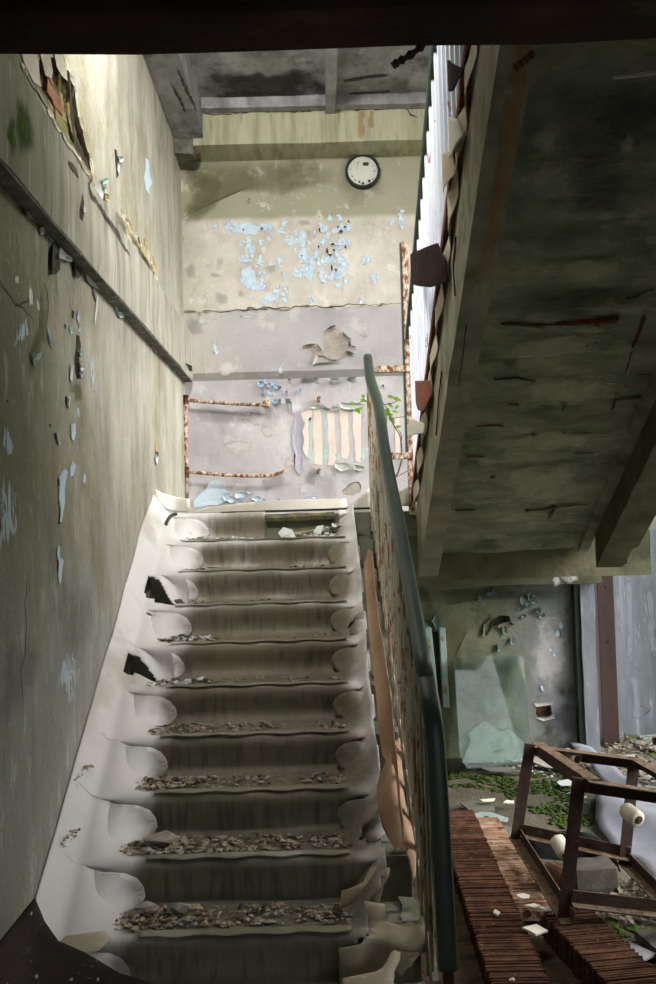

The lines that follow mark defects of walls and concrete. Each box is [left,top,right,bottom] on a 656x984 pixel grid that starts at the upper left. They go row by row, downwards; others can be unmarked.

damp [212,70,324,98]
flaking render [20,54,124,200]
peeling [144,158,152,195]
flaking render [121,209,158,280]
peeling [213,214,353,306]
crack [0,281,49,328]
flaking render [303,325,356,365]
corrosion [502,315,618,328]
peeling [49,423,76,445]
peeling [258,373,365,476]
peeling [57,460,86,525]
peeling [481,592,545,651]